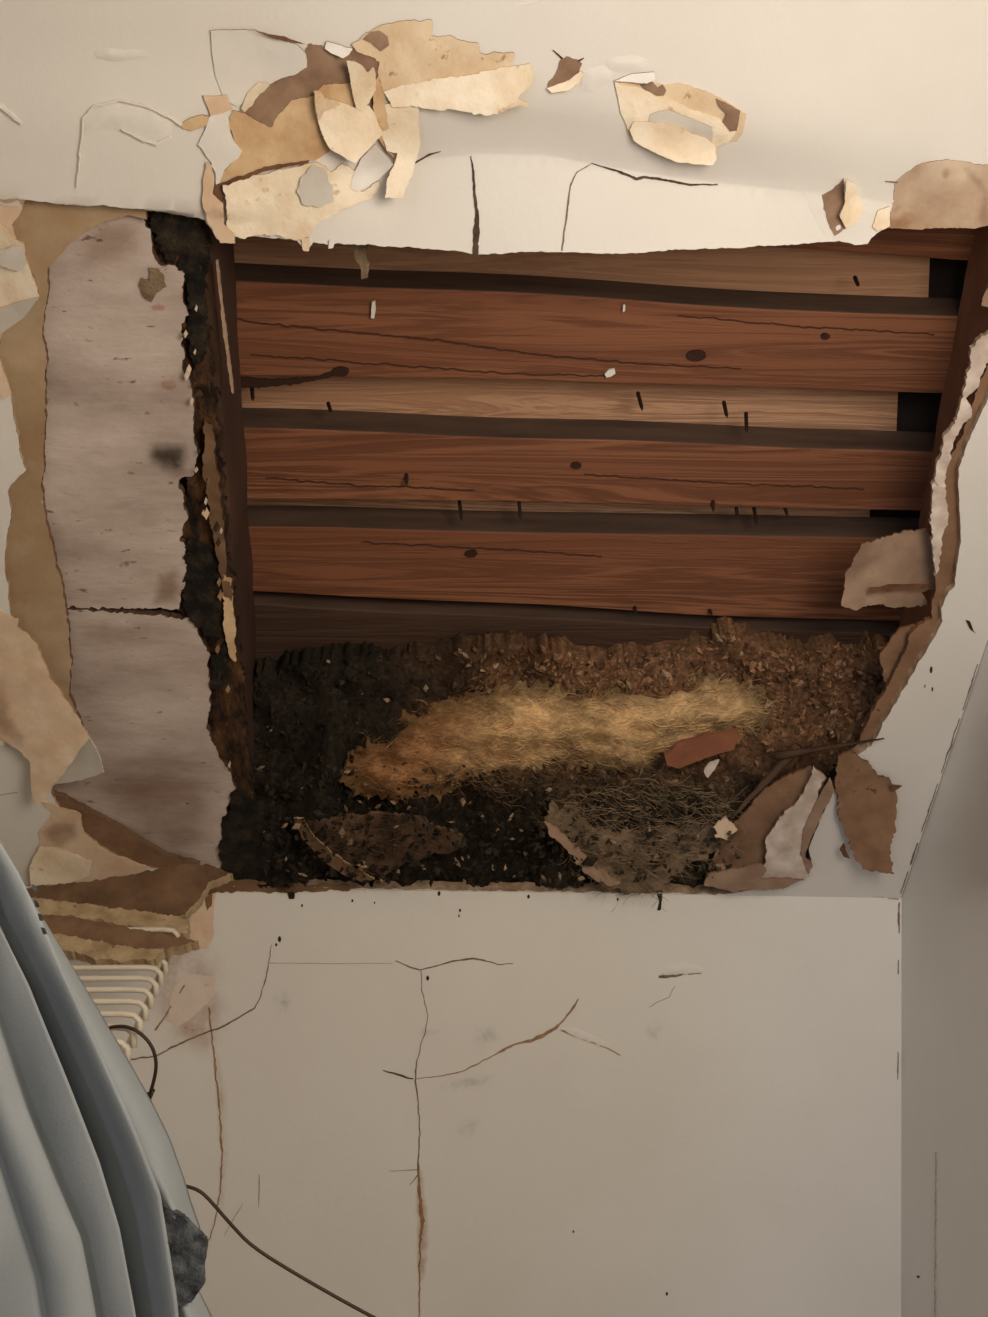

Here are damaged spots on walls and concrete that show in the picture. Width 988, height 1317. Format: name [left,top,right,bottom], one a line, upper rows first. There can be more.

peeling [0,198,39,339]
damp [139,211,213,370]
peeling [181,19,584,251]
crack [415,151,480,256]
crack [561,163,718,251]
peeling [614,72,746,165]
spalling [822,159,988,236]
damp [153,449,181,468]
damp [182,538,235,689]
spalling [858,330,988,746]
peeling [0,611,150,887]
crack [131,945,621,1317]